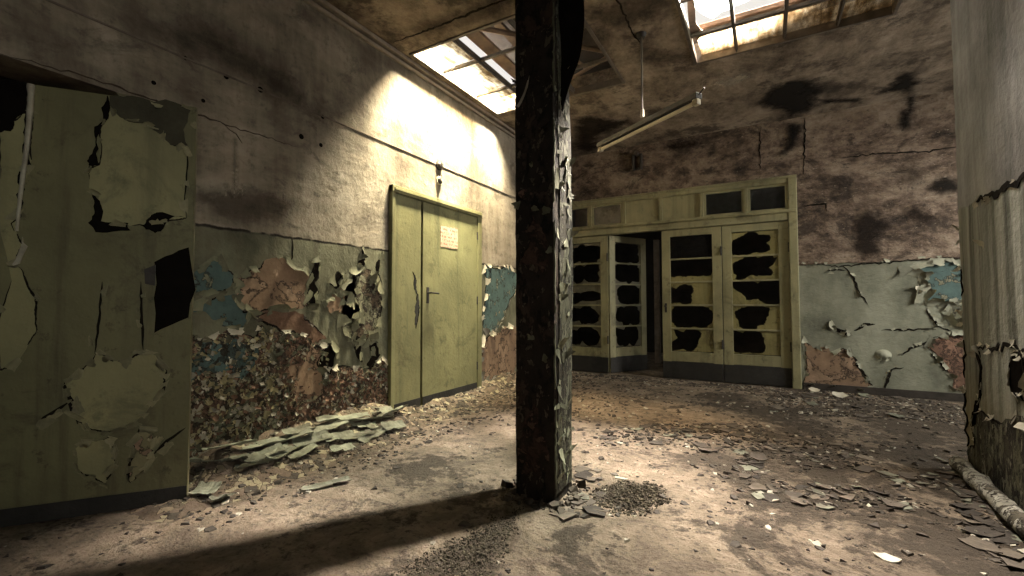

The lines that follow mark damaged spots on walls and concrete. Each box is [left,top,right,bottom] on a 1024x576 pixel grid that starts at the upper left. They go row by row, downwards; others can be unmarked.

peeling [0,78,41,371]
peeling [83,93,205,233]
damp [779,124,802,155]
crack [842,147,955,158]
damp [898,97,914,130]
peeling [972,172,1024,209]
peeling [190,245,389,458]
peeling [482,263,535,381]
crack [825,265,960,388]
peeling [801,255,1024,511]